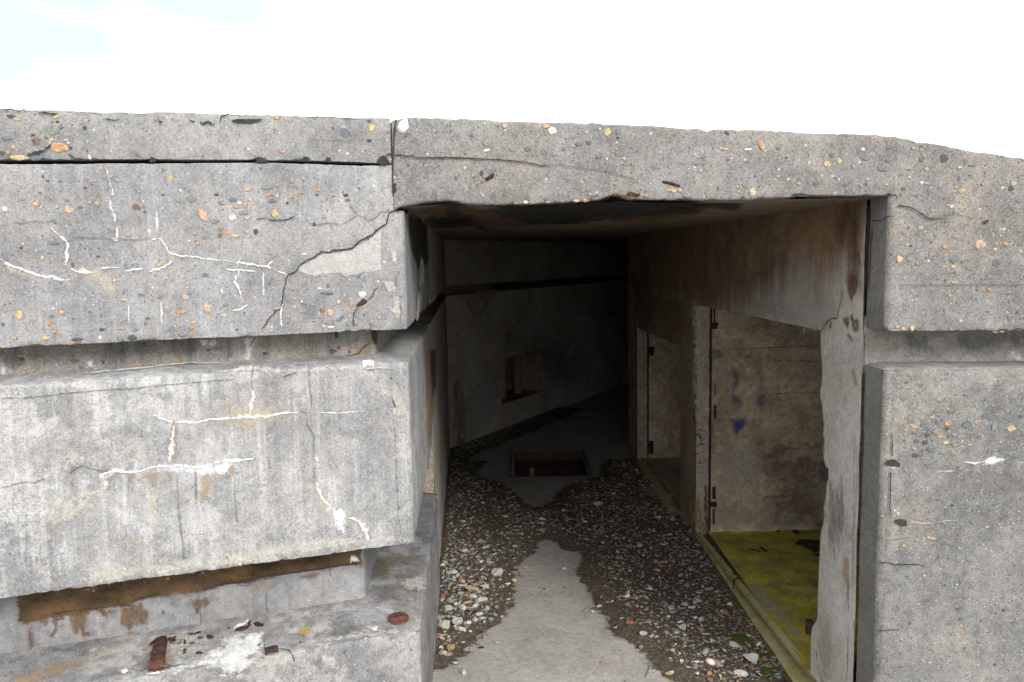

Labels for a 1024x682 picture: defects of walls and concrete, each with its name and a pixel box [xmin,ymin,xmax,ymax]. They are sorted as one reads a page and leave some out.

crack [394,154,635,179]
crack [14,220,147,241]
crack [871,205,974,222]
crack [251,204,400,388]
peeling [300,232,402,323]
water stain [40,391,298,526]
corrosion [19,603,148,651]
corrosion [149,572,214,671]
corrosion [227,611,264,631]